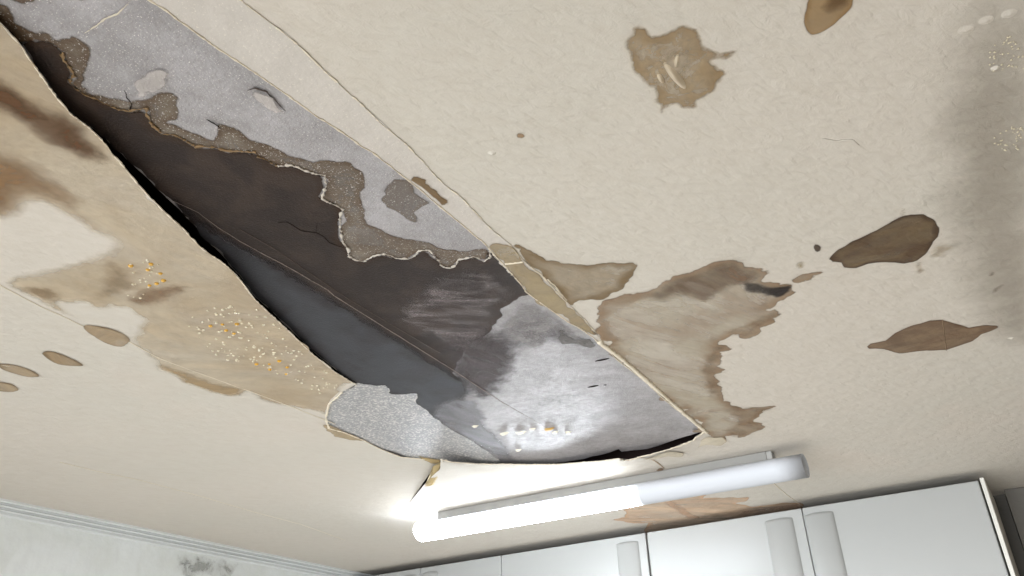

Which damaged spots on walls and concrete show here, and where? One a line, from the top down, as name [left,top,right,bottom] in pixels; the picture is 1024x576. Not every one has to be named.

water stain [804,0,853,35]
peeling [0,0,727,507]
water stain [0,0,822,460]
water stain [814,214,939,268]
water stain [867,320,998,353]